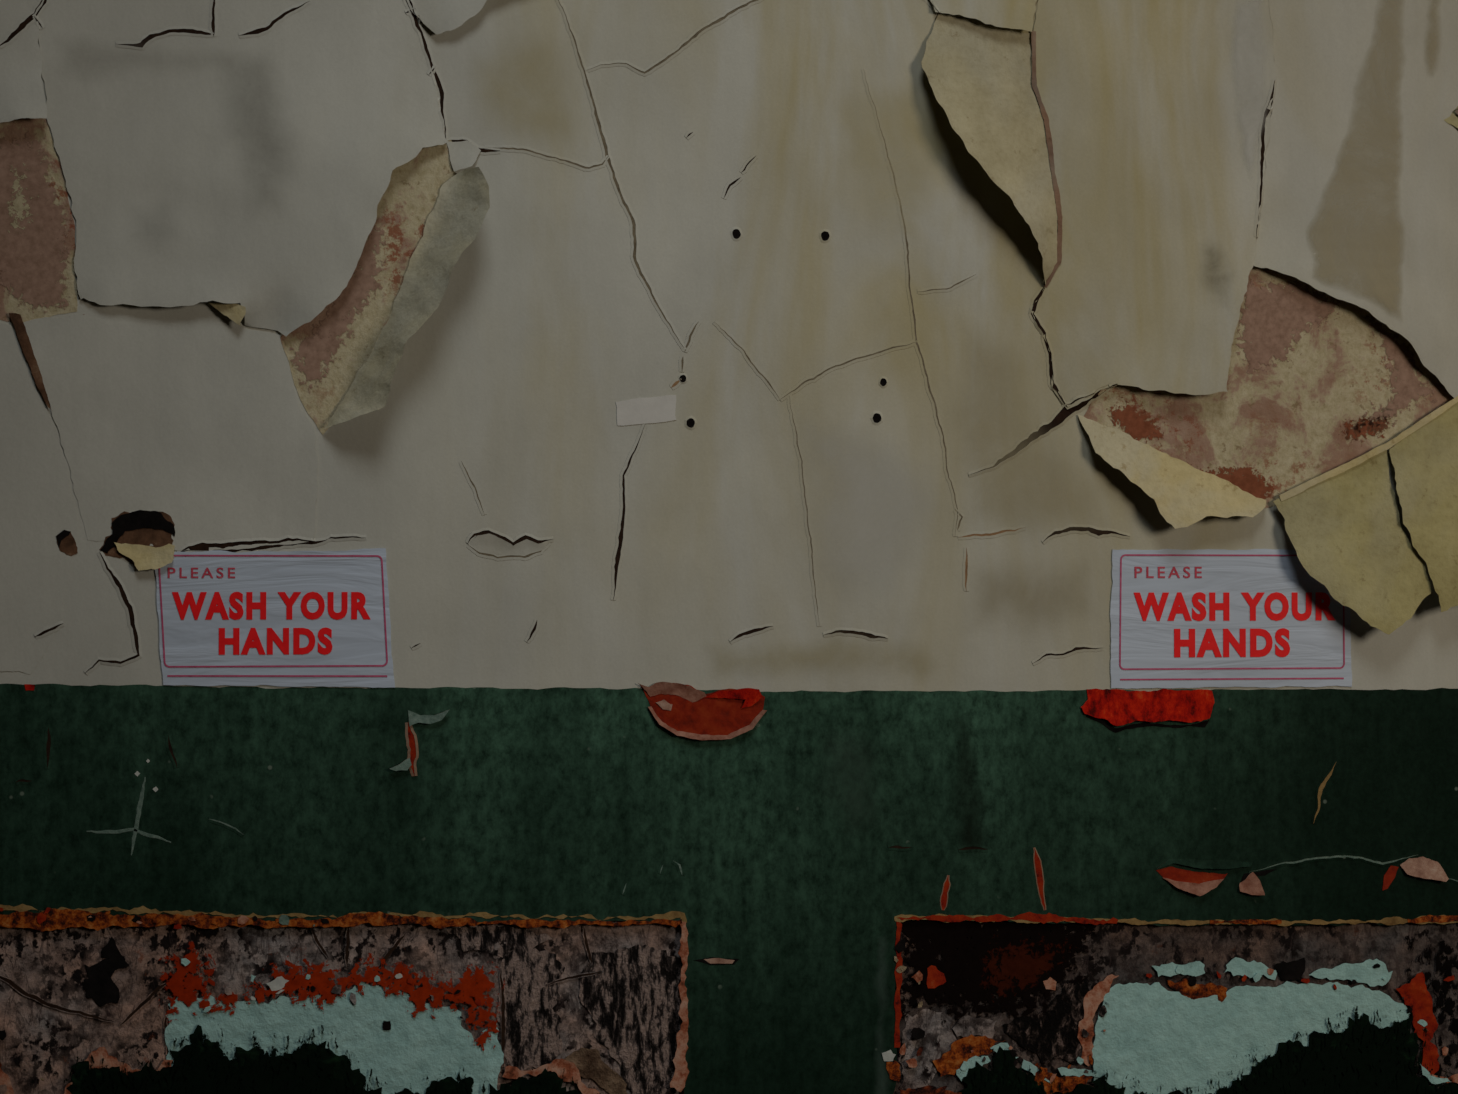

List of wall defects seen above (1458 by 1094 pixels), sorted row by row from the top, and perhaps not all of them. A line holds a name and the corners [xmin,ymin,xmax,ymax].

crack [115,0,312,50]
crack [1254,79,1277,237]
peeling [0,0,490,691]
crack [403,0,1130,644]
peeling [921,0,1458,635]
crack [84,551,142,675]
crack [176,533,366,553]
peeling [638,682,767,740]
crack [1032,644,1103,666]
peeling [1081,688,1215,733]
flaking render [0,904,738,1094]
flaking render [882,912,1458,1094]